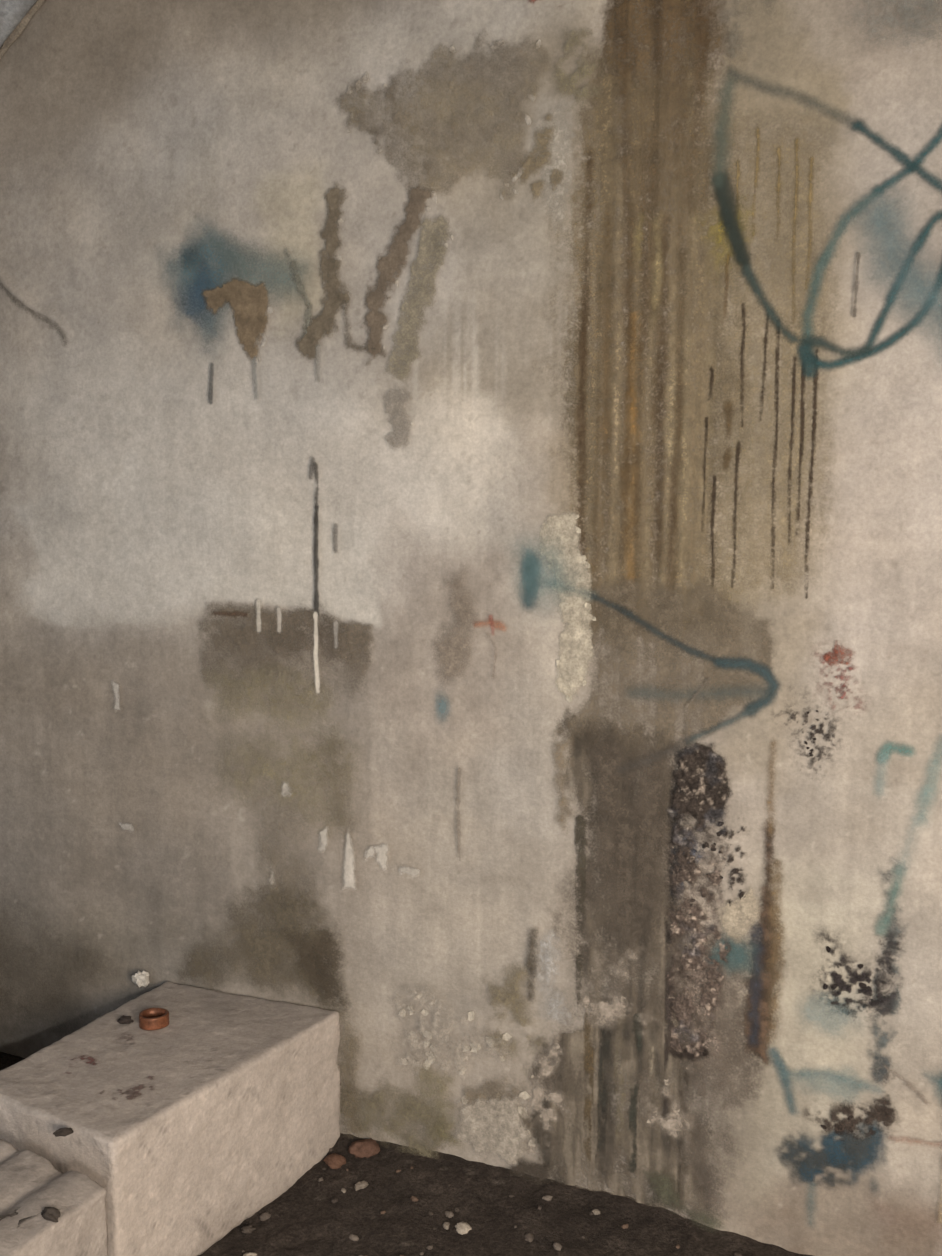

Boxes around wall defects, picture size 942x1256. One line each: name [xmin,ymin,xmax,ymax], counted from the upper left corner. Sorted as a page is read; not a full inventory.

rust [567,0,747,645]
leakage [181,815,459,1158]
leakage [490,113,827,1228]
leakage [869,895,902,1082]